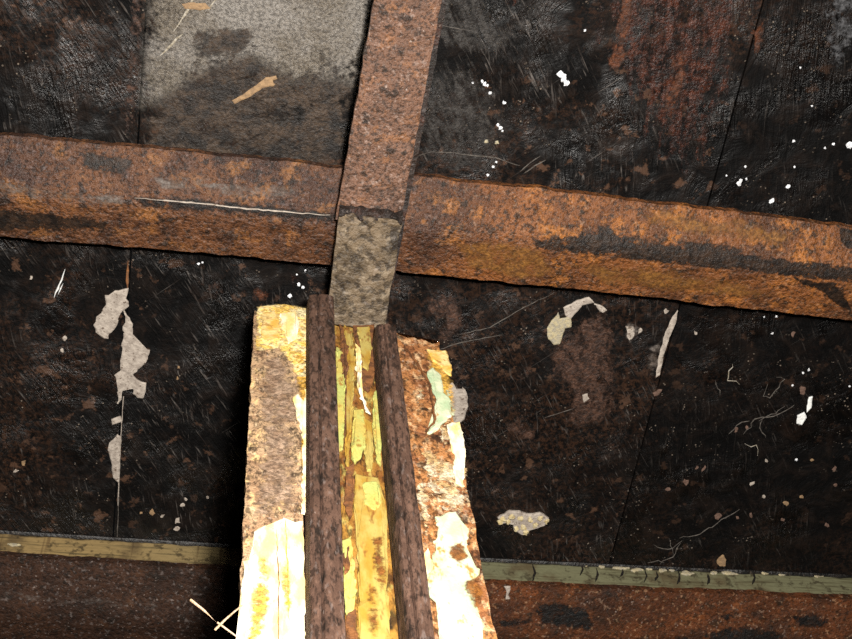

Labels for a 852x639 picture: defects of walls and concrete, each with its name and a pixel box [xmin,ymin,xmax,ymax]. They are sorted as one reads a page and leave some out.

damp [146,29,355,165]
rust [84,152,131,173]
rust [0,210,115,233]
rust [461,226,852,311]
peeling [93,262,150,537]
spalling [547,297,614,428]
peeling [649,308,678,377]
peeling [236,289,306,639]
peeling [404,346,484,639]
peeling [599,565,694,576]
rust [536,603,593,631]
rust [705,614,782,639]